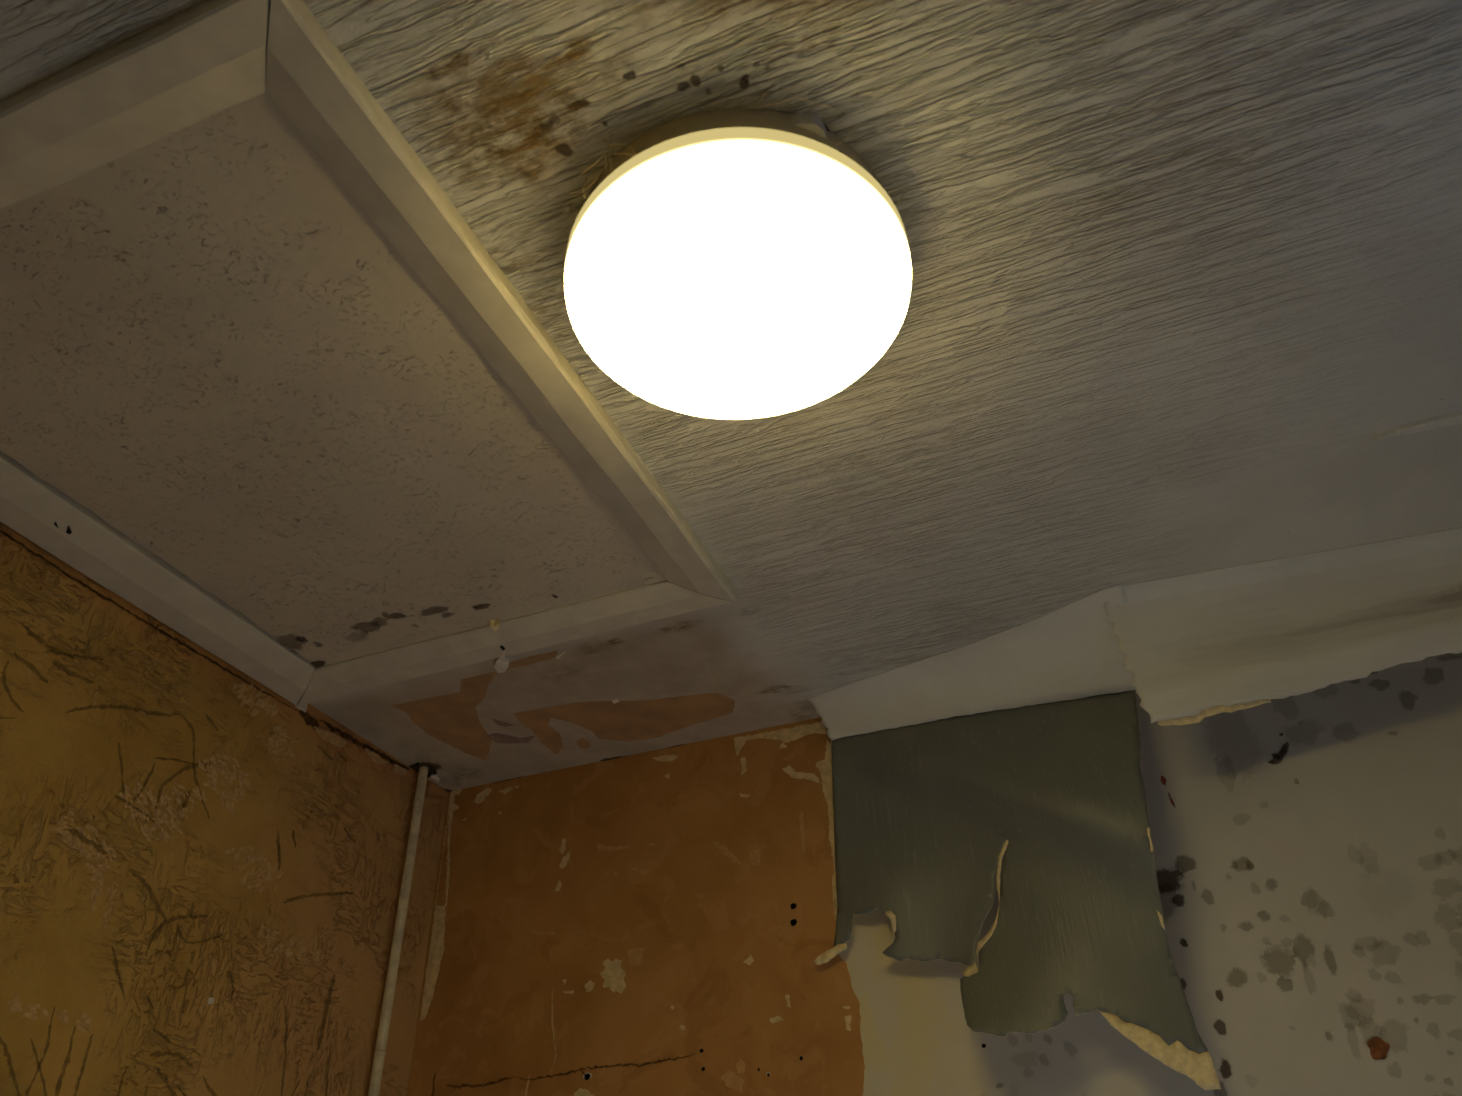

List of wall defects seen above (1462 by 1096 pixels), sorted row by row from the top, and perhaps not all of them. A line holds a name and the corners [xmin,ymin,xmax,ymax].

leakage [678,74,701,91]
leakage [739,74,749,89]
leakage [569,100,591,111]
leakage [556,144,573,156]
peeling [391,645,558,760]
peeling [513,693,735,754]
flaking render [734,721,826,783]
leakage [1156,870,1185,907]
flaking render [562,958,626,994]
crack [408,986,697,1096]
leakage [1214,1020,1226,1035]
leakage [1220,1061,1232,1078]